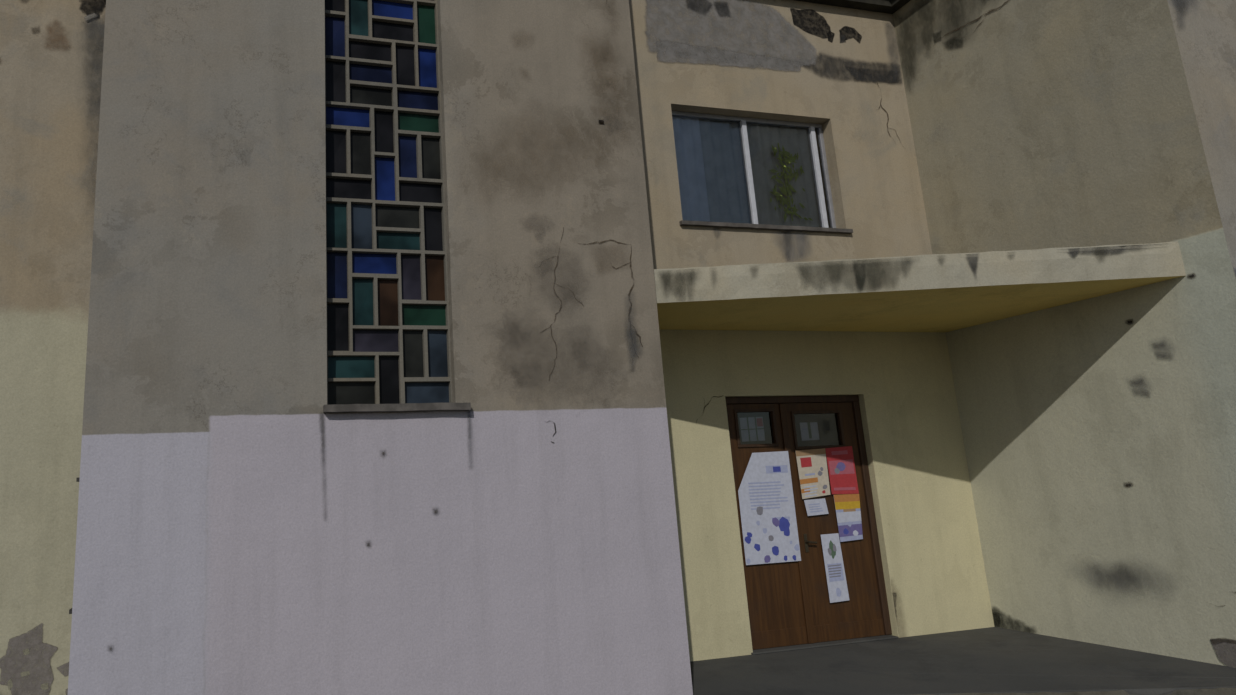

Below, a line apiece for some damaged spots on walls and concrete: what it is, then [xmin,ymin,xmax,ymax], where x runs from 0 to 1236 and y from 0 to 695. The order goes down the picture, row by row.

peeling [645,0,862,71]
crack [944,1,1008,36]
water stain [854,261,865,289]
water stain [967,254,977,272]
crack [542,227,643,381]
peeling [0,623,69,695]
peeling [1210,638,1236,668]